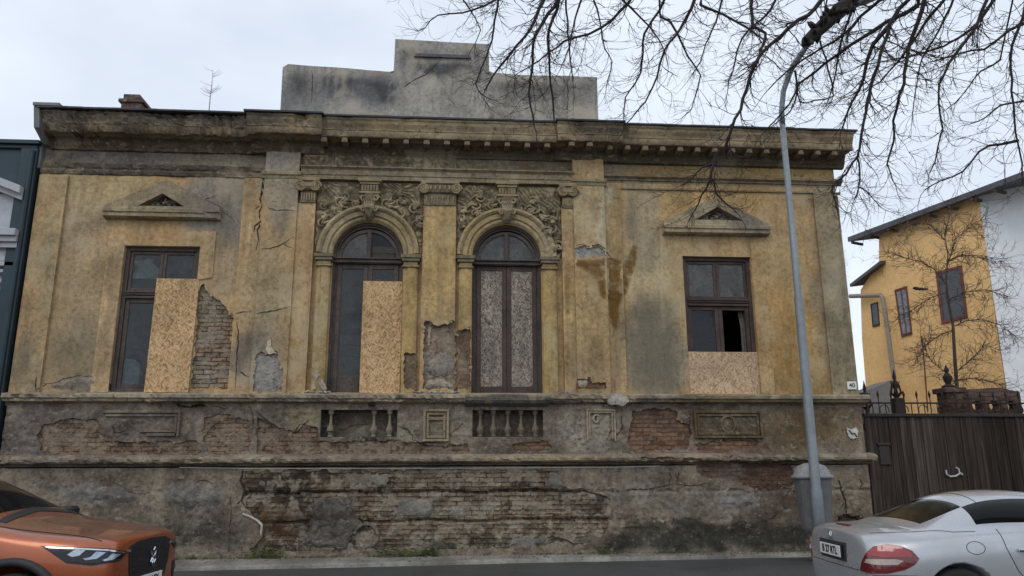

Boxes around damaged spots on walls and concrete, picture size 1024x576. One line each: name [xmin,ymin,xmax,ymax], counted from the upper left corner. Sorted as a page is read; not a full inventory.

crack [206,182,294,249]
flaking render [191,285,233,390]
flaking render [252,340,283,392]
flaking render [403,321,472,391]
flaking render [38,414,470,455]
flaking render [576,377,794,491]
flaking render [241,467,612,553]